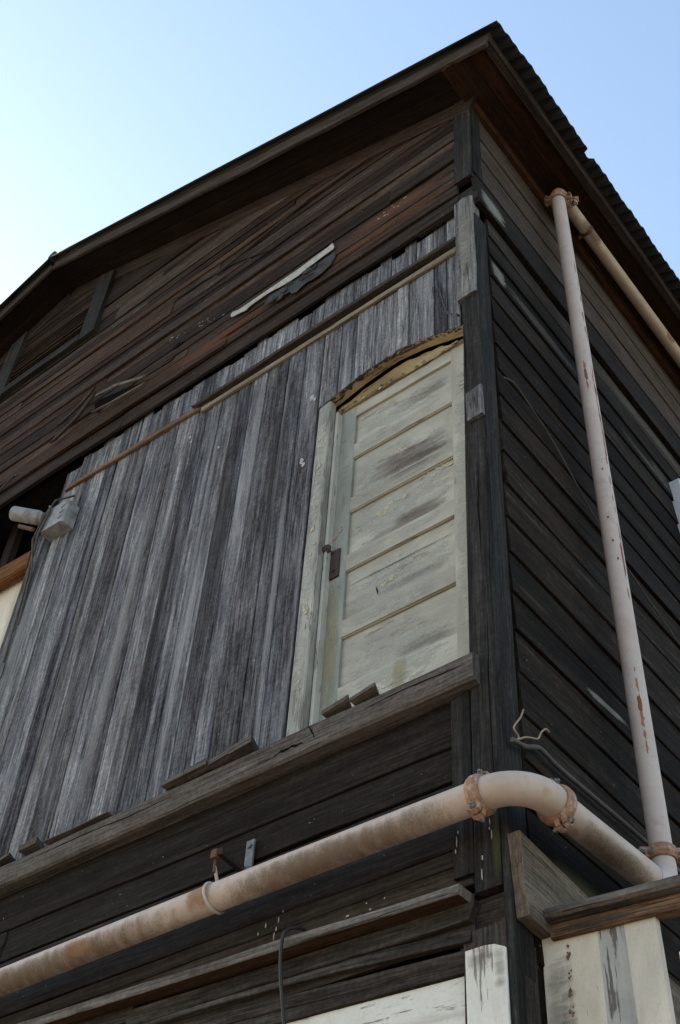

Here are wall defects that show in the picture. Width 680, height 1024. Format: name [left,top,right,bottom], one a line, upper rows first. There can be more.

peeling [231,243,336,317]